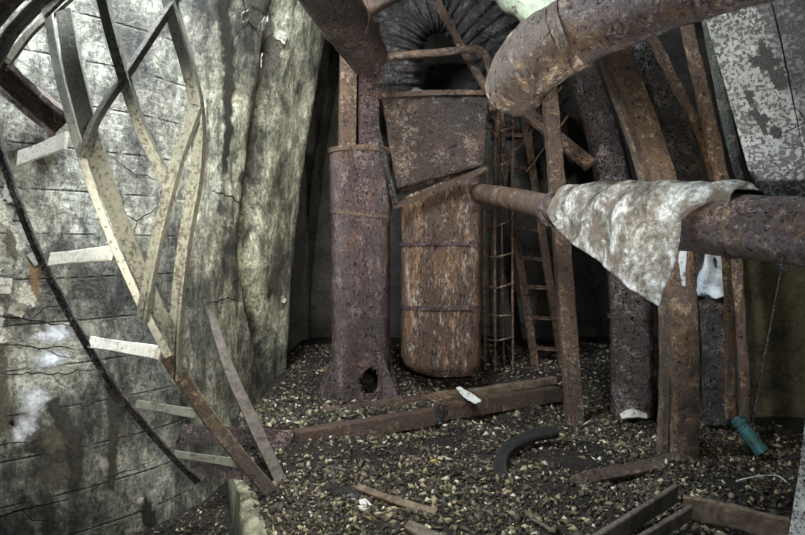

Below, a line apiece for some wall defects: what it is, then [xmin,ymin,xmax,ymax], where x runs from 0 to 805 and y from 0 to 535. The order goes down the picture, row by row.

water stain [217,0,236,176]
crack [771,1,805,156]
crack [0,306,71,326]
crack [0,344,97,388]
water stain [36,350,63,366]
water stain [39,325,70,341]
water stain [0,358,84,490]
crack [0,455,164,521]